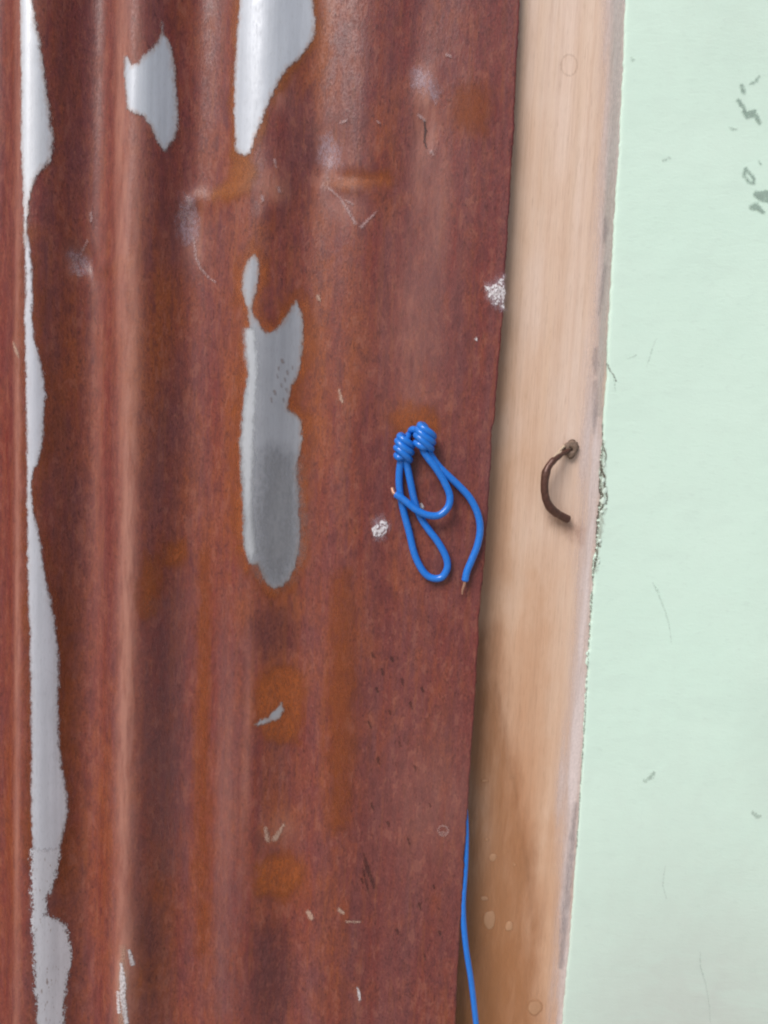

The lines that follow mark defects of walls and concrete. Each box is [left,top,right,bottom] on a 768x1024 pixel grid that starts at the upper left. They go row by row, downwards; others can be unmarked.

peeling [123,22,179,151]
corrosion [212,83,266,198]
peeling [233,0,316,156]
corrosion [271,0,318,97]
corrosion [22,291,49,393]
peeling [239,254,304,589]
corrosion [234,243,314,596]
corrosion [395,404,438,440]
peeling [13,0,73,1024]
corrosion [45,559,69,804]
corrosion [257,667,303,743]